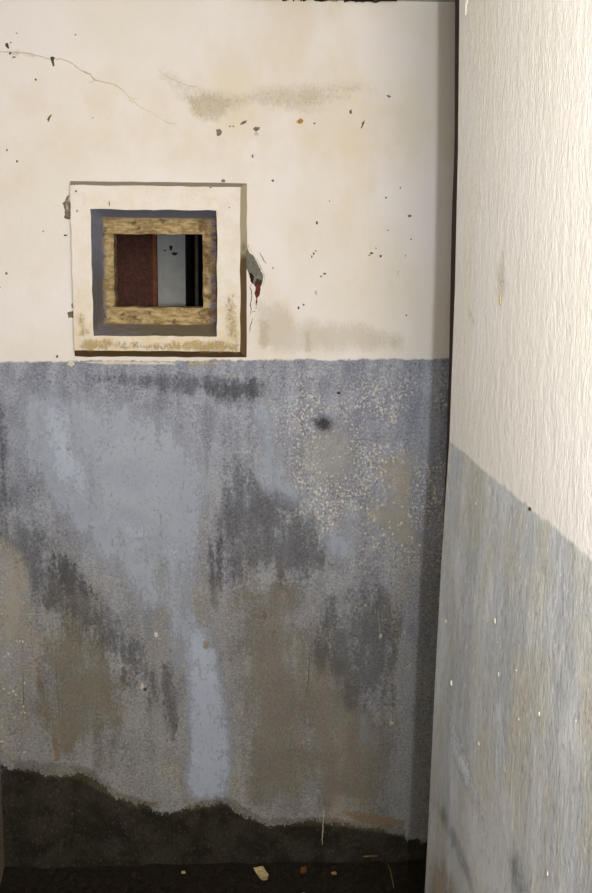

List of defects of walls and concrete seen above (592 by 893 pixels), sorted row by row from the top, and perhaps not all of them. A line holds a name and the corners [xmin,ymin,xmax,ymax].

crack [0,51,177,124]
damp [1,390,427,869]